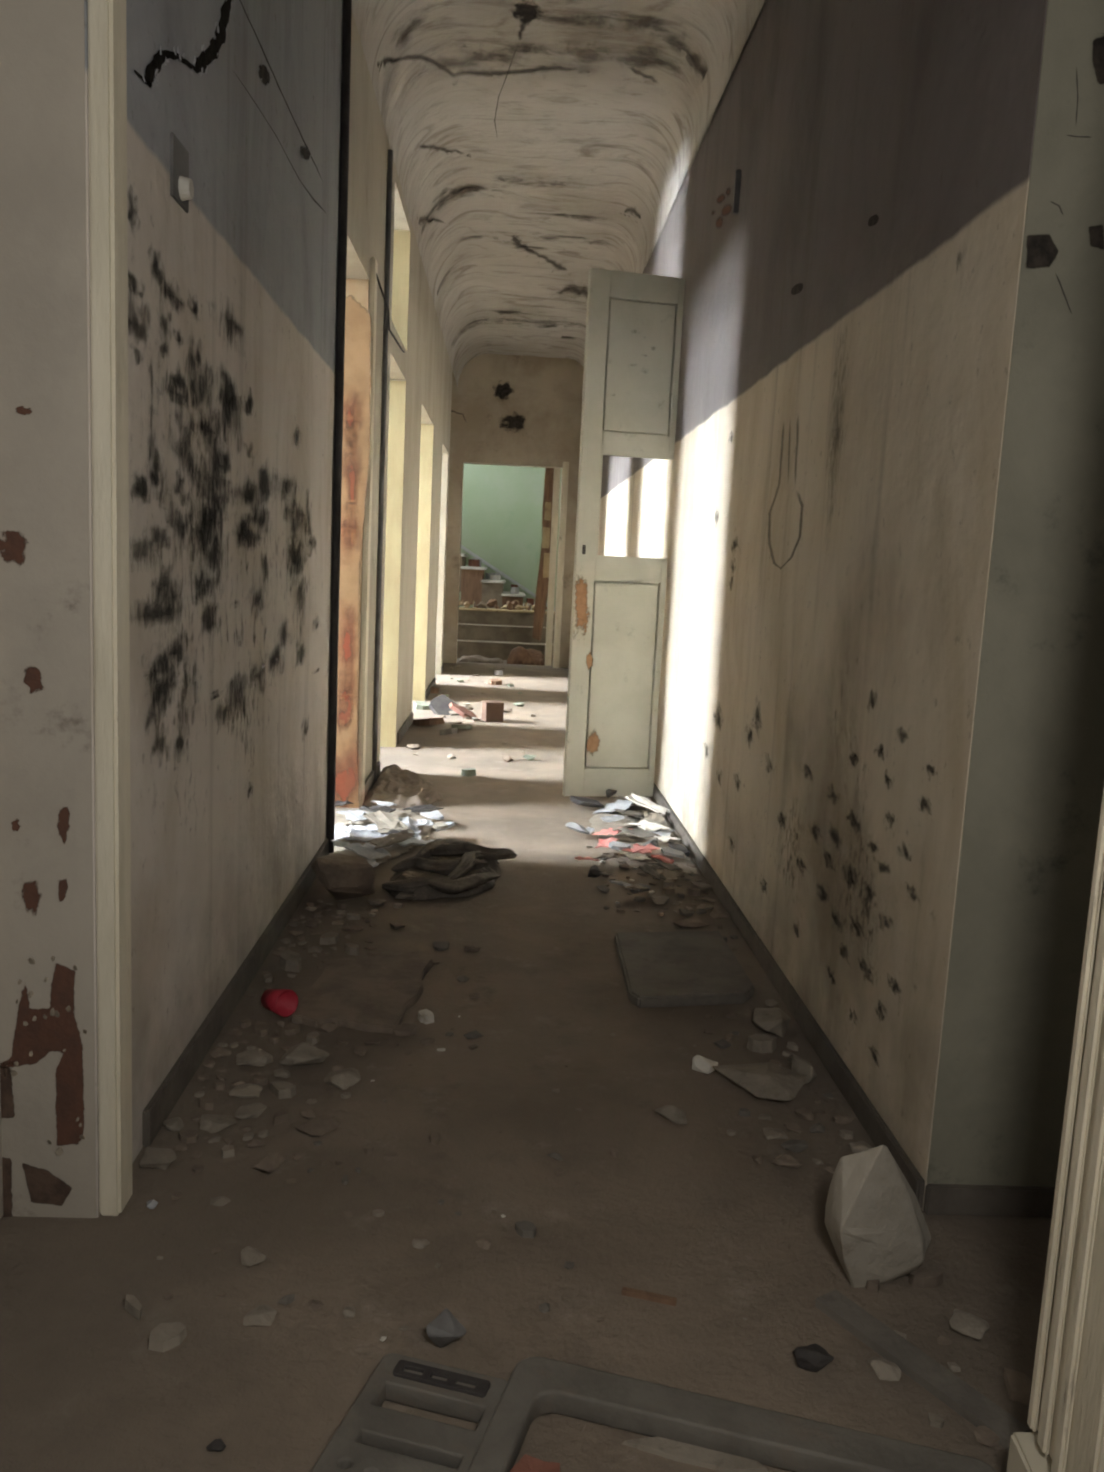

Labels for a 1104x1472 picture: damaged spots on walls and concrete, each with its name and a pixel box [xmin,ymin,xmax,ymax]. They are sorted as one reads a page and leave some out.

flaking render [1093,36,1104,84]
crack [134,0,326,213]
flaking render [1026,234,1058,268]
flaking render [1089,225,1104,249]
flaking render [494,382,525,430]
leakage [128,252,319,770]
peeling [575,578,590,635]
peeling [586,731,600,756]
peeling [0,956,87,1217]